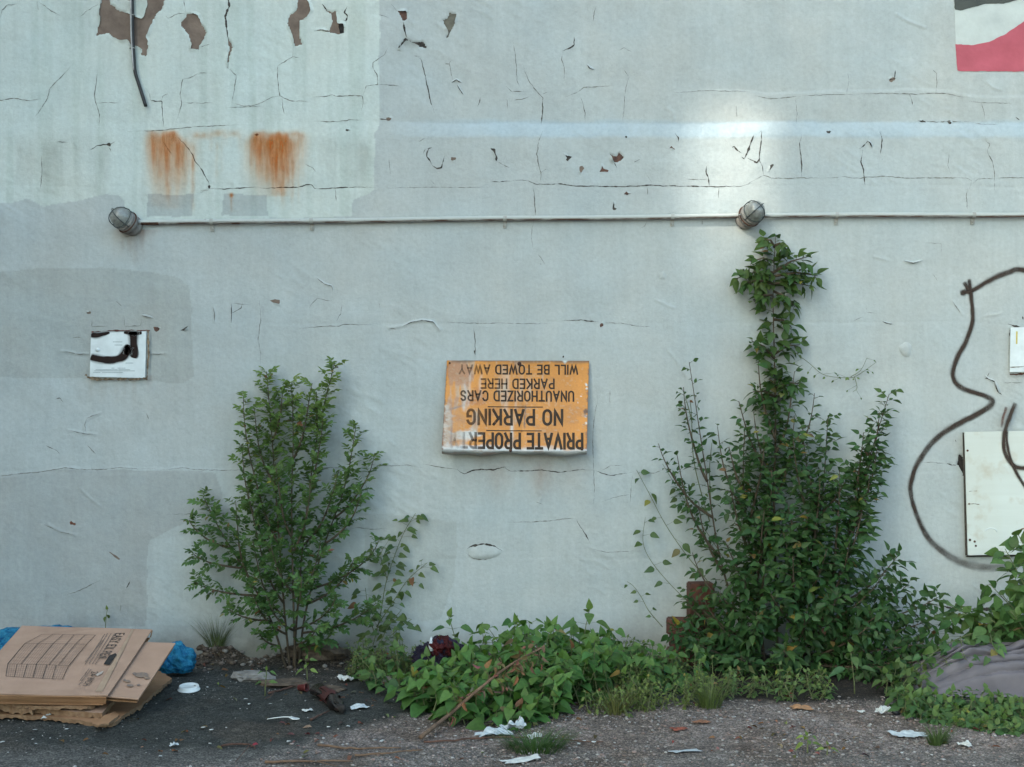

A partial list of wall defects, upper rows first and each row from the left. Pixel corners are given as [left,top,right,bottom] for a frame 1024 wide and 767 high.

peeling [96,0,165,56]
peeling [181,11,207,52]
peeling [286,0,348,48]
peeling [397,38,426,52]
peeling [443,12,459,38]
crack [92,0,1023,264]
peeling [600,153,623,172]
crack [363,399,659,500]